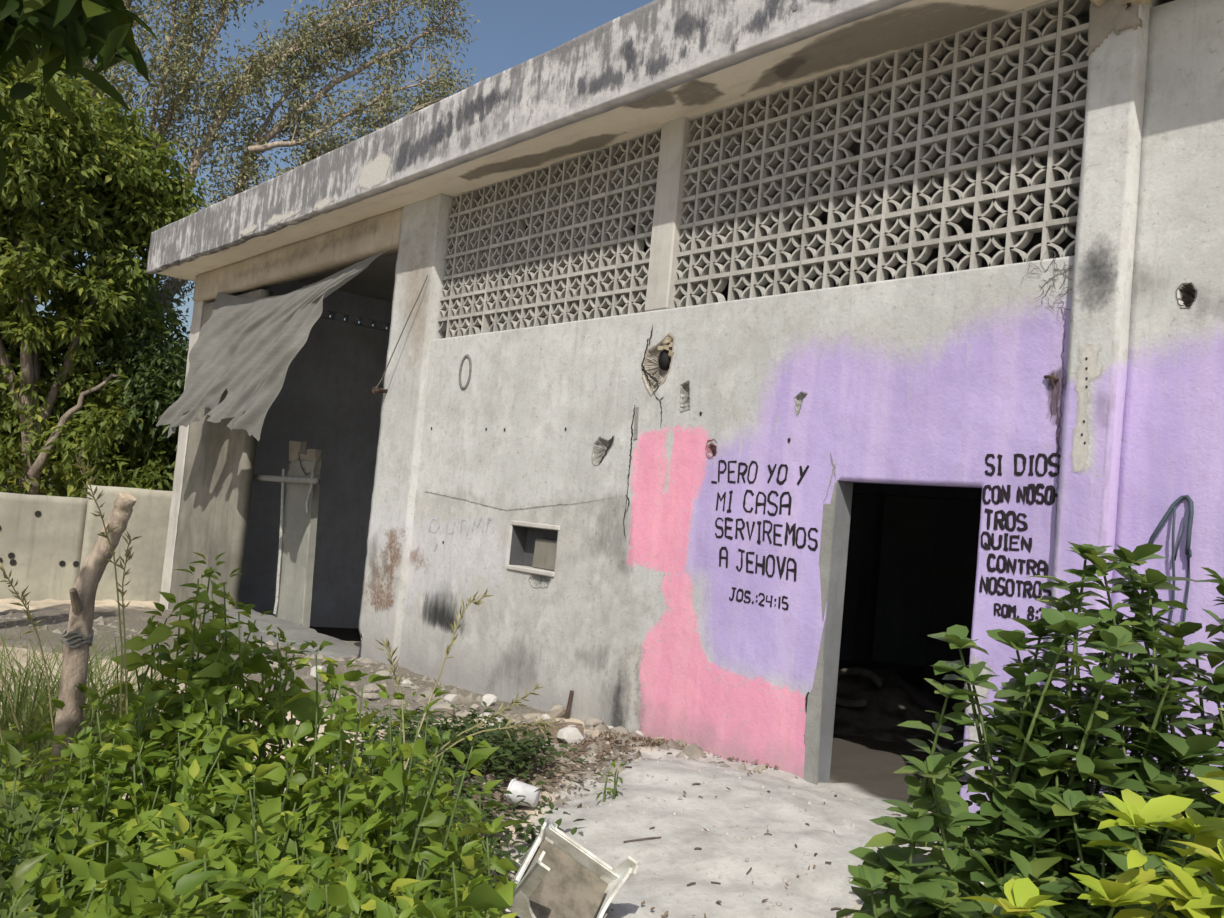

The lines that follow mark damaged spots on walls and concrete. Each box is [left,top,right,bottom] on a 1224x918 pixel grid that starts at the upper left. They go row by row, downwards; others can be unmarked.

water stain [577,11,708,94]
water stain [753,4,1006,90]
spalling [1086,0,1151,57]
water stain [396,90,509,170]
water stain [462,135,613,180]
spalling [1176,282,1197,308]
crack [425,325,663,537]
spalling [592,435,615,466]
spalling [642,332,674,396]
spalling [680,380,690,413]
crack [1022,248,1074,540]
rust [1044,370,1064,465]